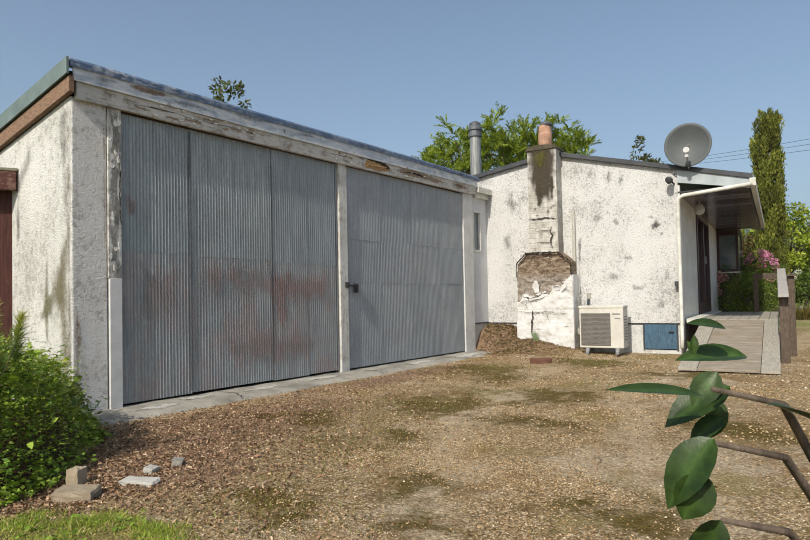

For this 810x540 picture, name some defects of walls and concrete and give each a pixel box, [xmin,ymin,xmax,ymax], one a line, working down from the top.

peeling [132,103,255,135]
peeling [108,116,122,274]
peeling [368,159,444,184]
water stain [528,149,554,205]
crack [528,217,555,245]
water stain [42,234,70,355]
spalling [516,251,572,302]
crack [520,286,569,333]